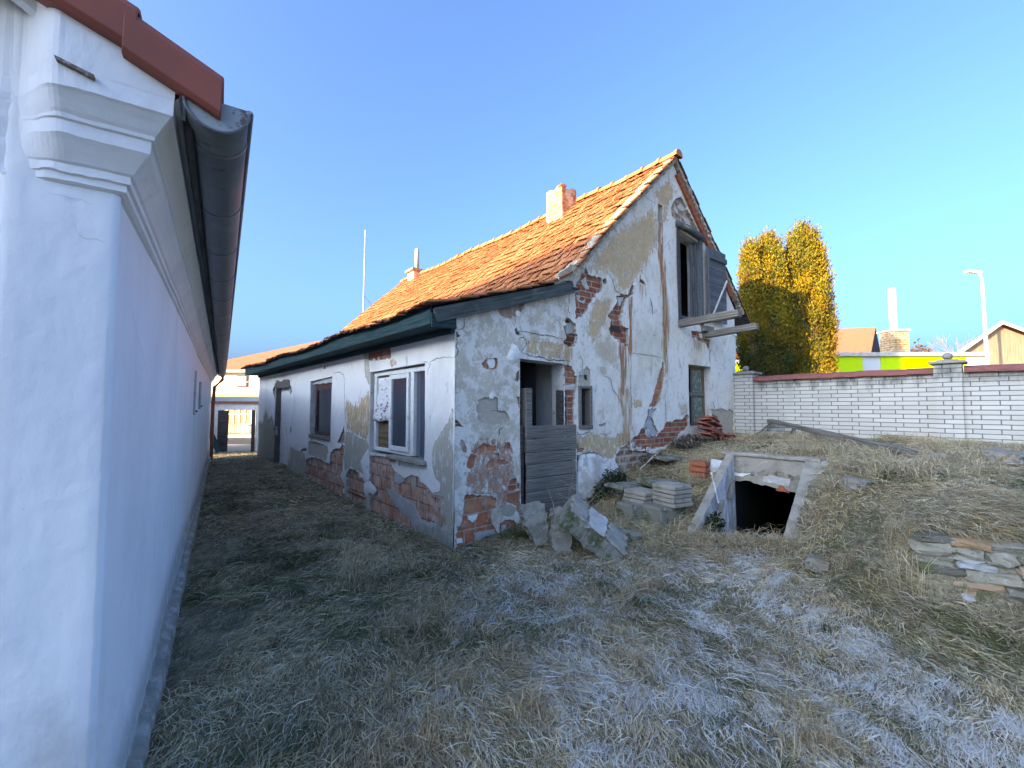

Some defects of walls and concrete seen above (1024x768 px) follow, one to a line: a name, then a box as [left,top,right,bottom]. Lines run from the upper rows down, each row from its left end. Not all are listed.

flaking render [290,348,520,548]
crack [515,276,666,459]
flaking render [527,340,687,474]
peeling [563,182,699,373]